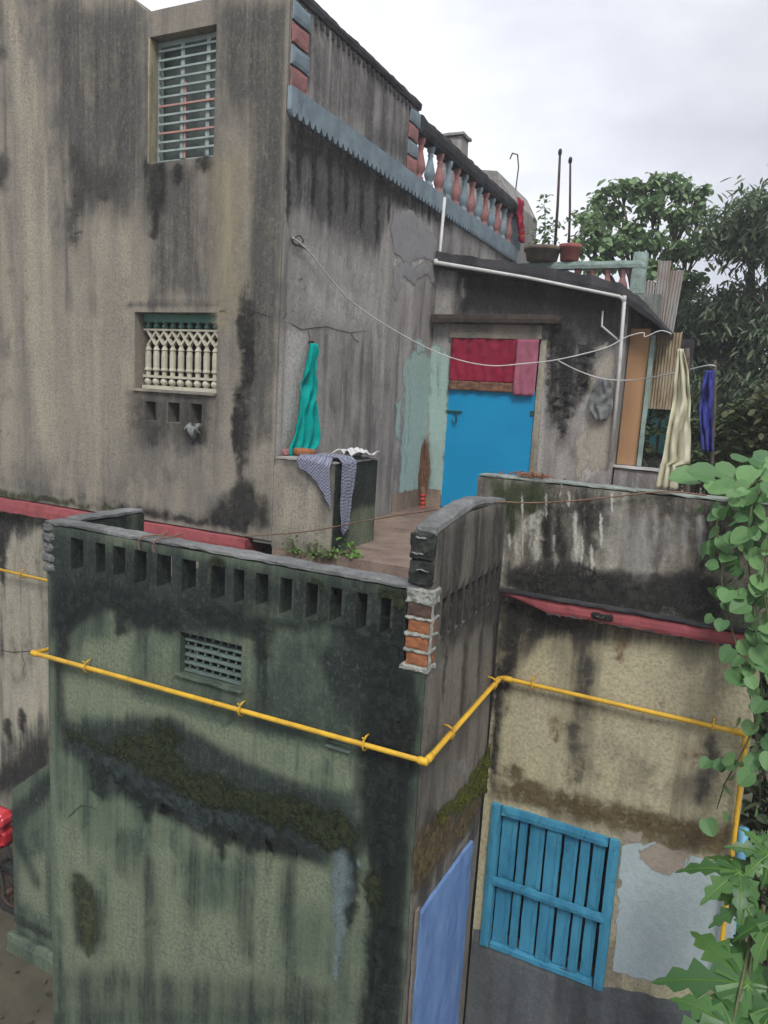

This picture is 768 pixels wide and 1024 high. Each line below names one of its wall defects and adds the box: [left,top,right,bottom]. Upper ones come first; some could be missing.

leakage [286,125,450,240]
leakage [137,154,268,532]
crack [251,310,362,342]
peeling [395,339,449,495]
leakage [393,259,621,438]
leakage [0,512,23,584]
leakage [0,489,89,509]
leakage [442,480,730,854]
leakage [74,736,297,859]
peeling [612,831,736,981]